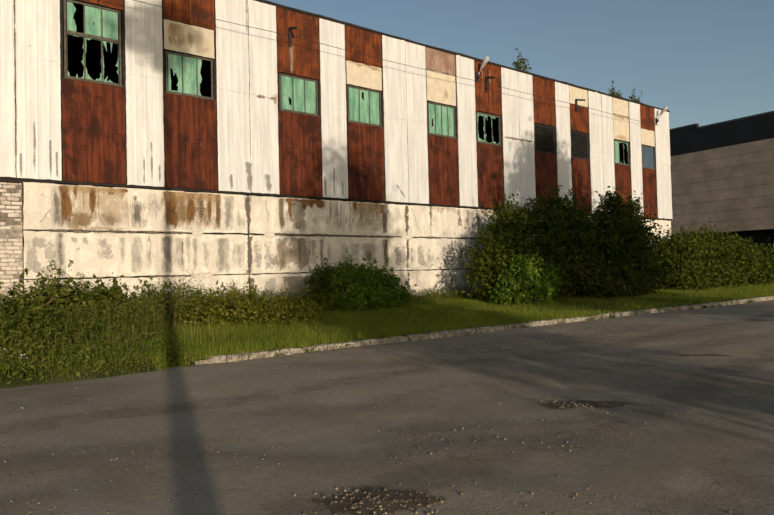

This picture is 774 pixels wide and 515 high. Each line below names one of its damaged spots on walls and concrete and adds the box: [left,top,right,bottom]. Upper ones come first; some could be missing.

rust [59,185,128,229]
rust [162,192,220,228]
rust [286,198,324,215]